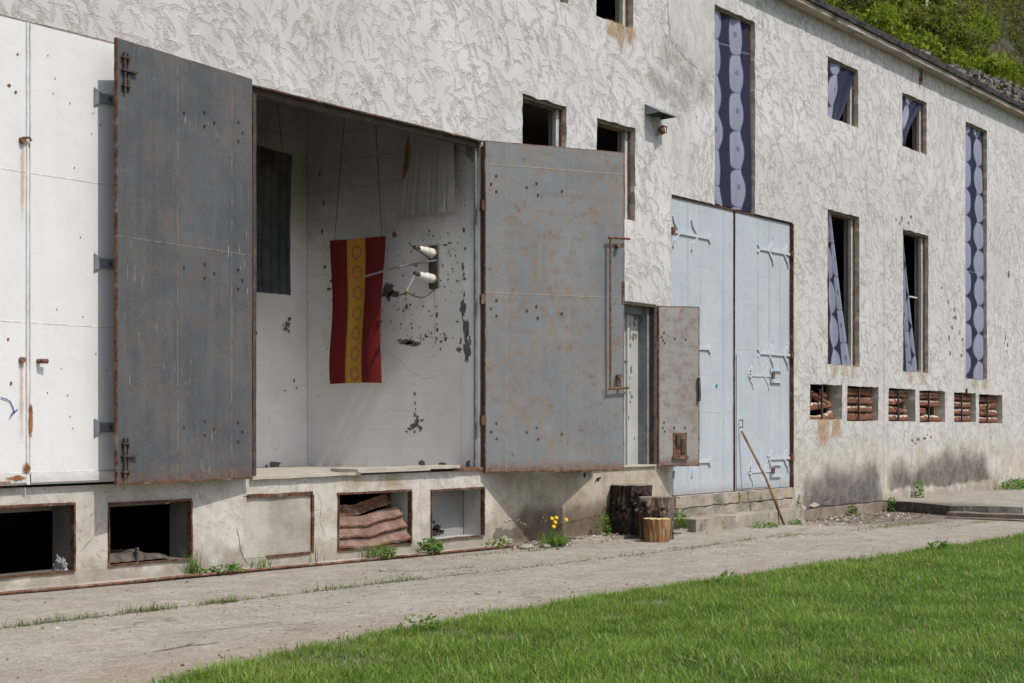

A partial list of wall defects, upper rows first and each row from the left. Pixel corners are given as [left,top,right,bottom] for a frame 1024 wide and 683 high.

peeling [380,227,472,365]
peeling [405,384,424,433]
rust [0,463,31,484]
leakage [804,466,878,510]
leakage [891,454,988,489]